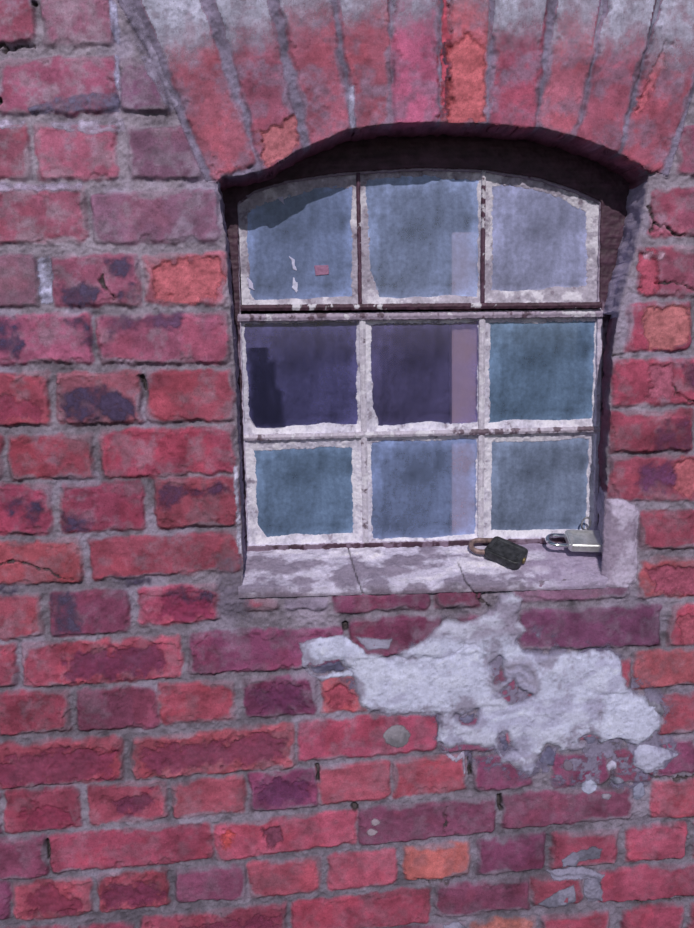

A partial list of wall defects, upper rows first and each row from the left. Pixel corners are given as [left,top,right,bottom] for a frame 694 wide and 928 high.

spalling [437,0,486,123]
spalling [260,114,299,167]
crack [646,205,684,236]
crack [0,559,74,580]
peeling [299,593,678,800]